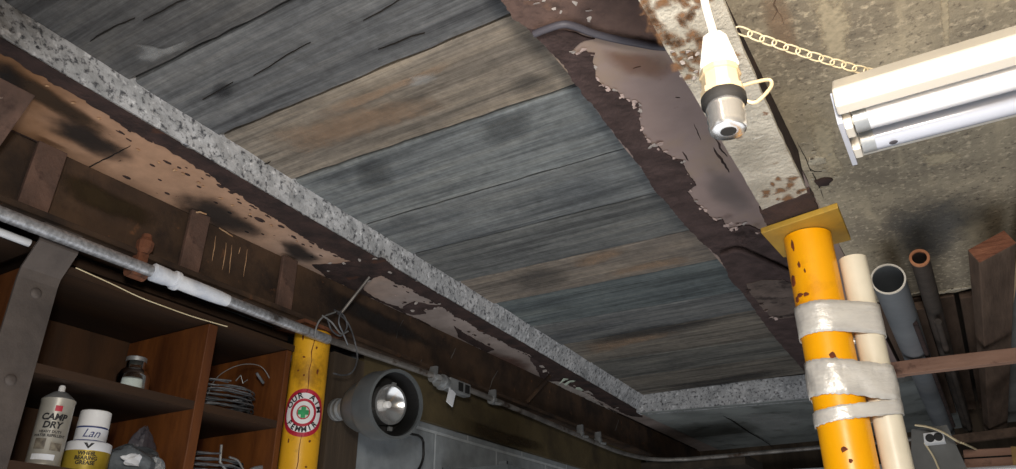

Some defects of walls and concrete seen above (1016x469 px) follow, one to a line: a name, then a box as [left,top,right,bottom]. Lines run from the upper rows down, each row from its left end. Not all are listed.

corrosion [641,0,710,80]
peeling [501,0,809,371]
corrosion [762,177,807,201]
spalling [801,142,838,190]
peeling [0,37,697,450]